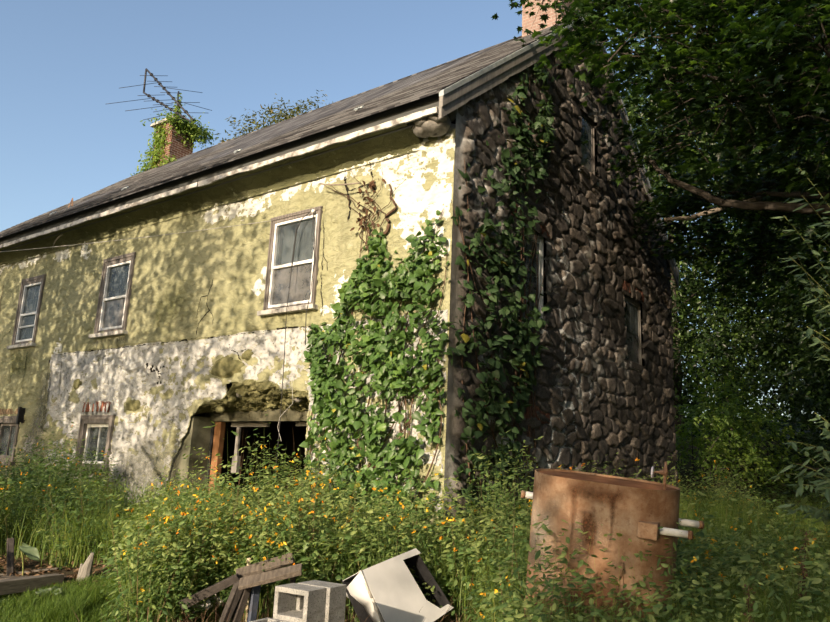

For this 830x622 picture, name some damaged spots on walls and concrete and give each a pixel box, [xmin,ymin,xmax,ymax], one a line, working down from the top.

peeling [201,104,466,264]
crack [40,223,328,446]
peeling [23,266,448,511]